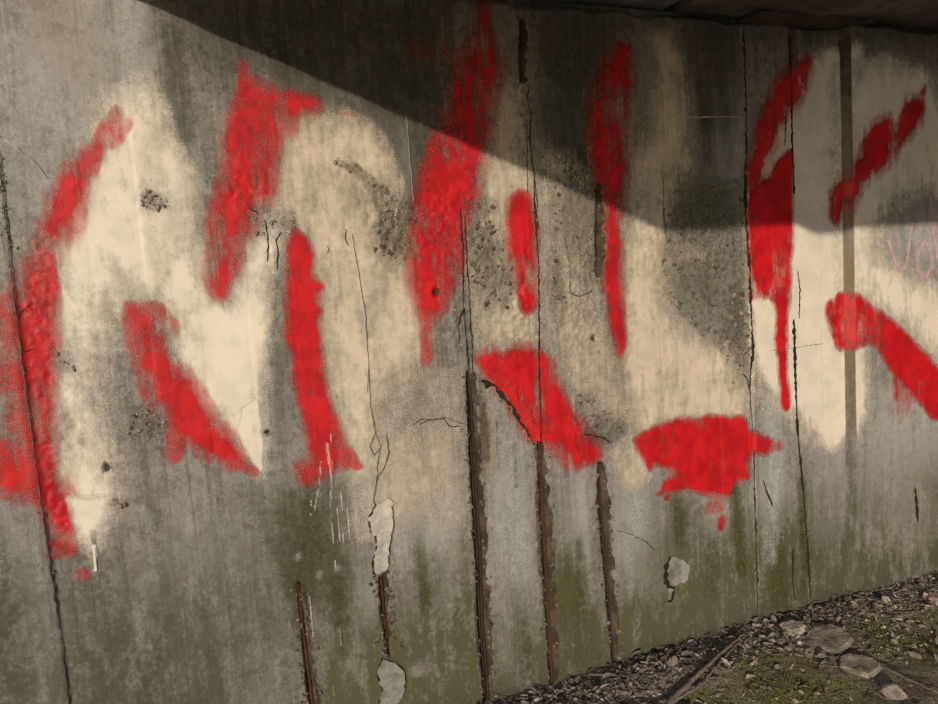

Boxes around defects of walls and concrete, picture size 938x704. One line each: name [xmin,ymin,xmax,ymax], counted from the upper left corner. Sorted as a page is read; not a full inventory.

leakage [293,488,342,626]
crack [326,229,390,508]
peeling [367,498,406,704]
crack [413,416,467,427]
peeling [663,556,690,603]
leakage [674,498,687,542]
leakage [730,485,746,574]
leakage [764,398,780,521]